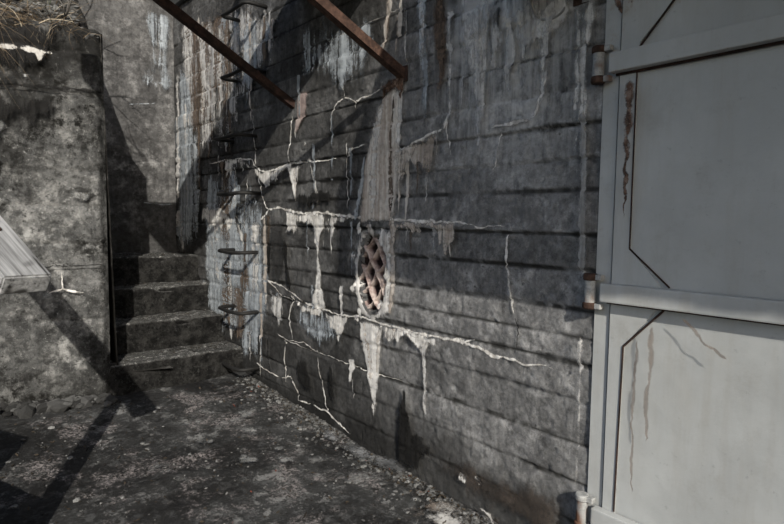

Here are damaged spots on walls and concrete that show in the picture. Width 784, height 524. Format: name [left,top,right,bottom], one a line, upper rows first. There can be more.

damp [382,0,406,57]
damp [446,0,587,146]
damp [182,0,454,415]
spalling [350,222,388,318]
rust [623,81,634,213]
damp [345,390,429,472]